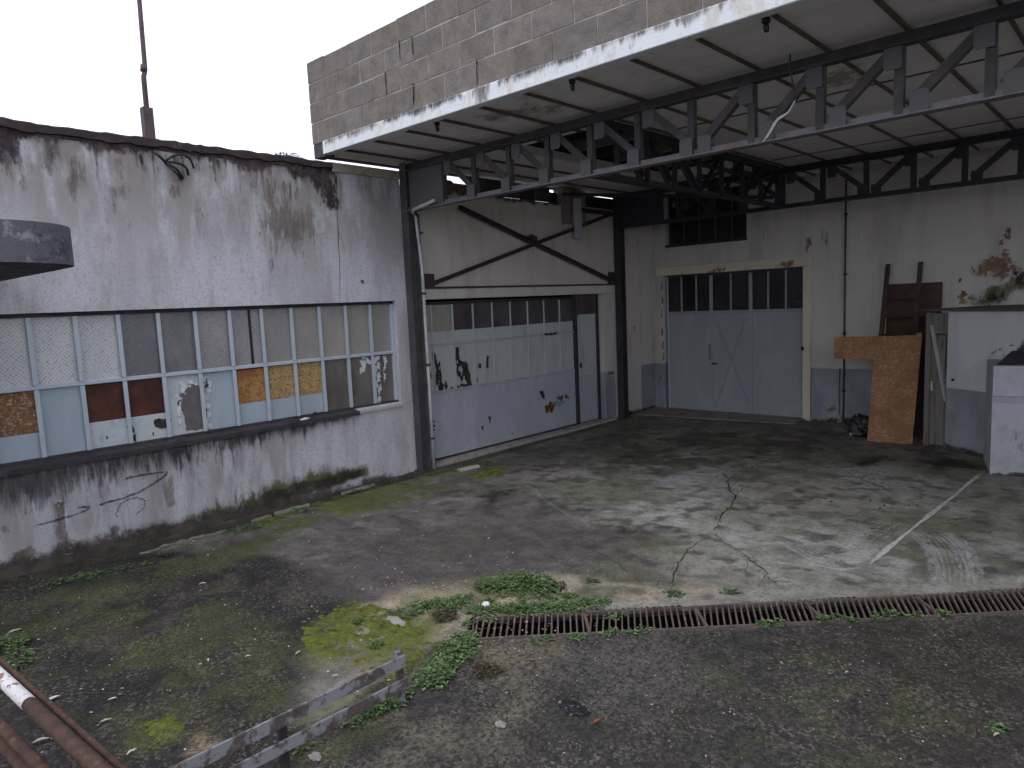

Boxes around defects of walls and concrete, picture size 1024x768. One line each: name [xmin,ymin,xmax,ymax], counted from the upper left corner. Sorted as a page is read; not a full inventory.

leakage [498,2,722,85]
leakage [325,94,460,142]
leakage [0,126,341,249]
flaking render [957,227,1022,304]
peeling [152,376,212,436]
peeling [360,354,387,403]
peeling [427,346,489,391]
corrosion [539,391,569,414]
leakage [0,419,338,506]
leakage [0,467,393,581]
crack [655,473,805,589]